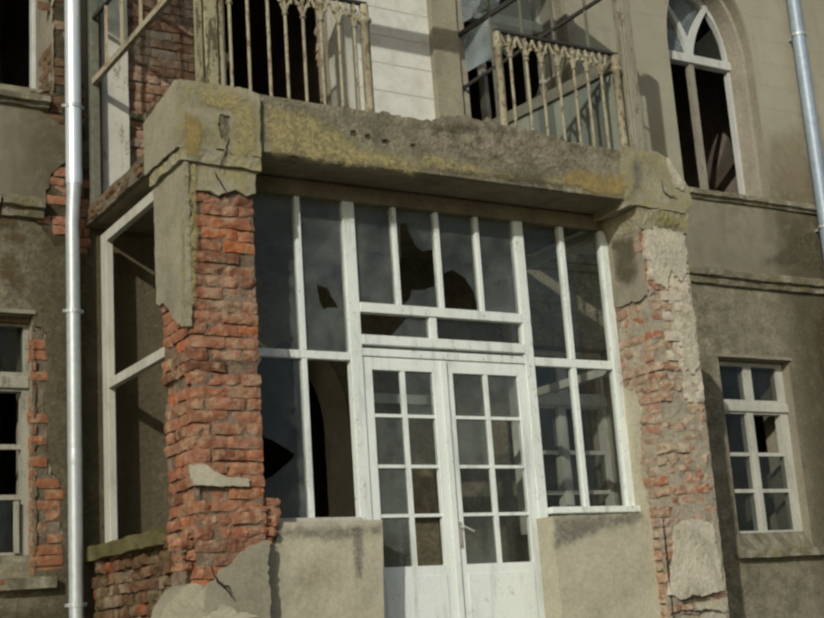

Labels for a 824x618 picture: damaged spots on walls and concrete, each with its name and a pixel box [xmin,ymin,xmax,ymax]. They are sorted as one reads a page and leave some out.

spalling [30,0,65,132]
spalling [32,164,66,247]
spalling [79,166,91,255]
crack [215,139,231,195]
leakage [266,106,624,195]
spalling [27,320,65,577]
spalling [89,114,281,618]
flaking render [607,225,730,618]